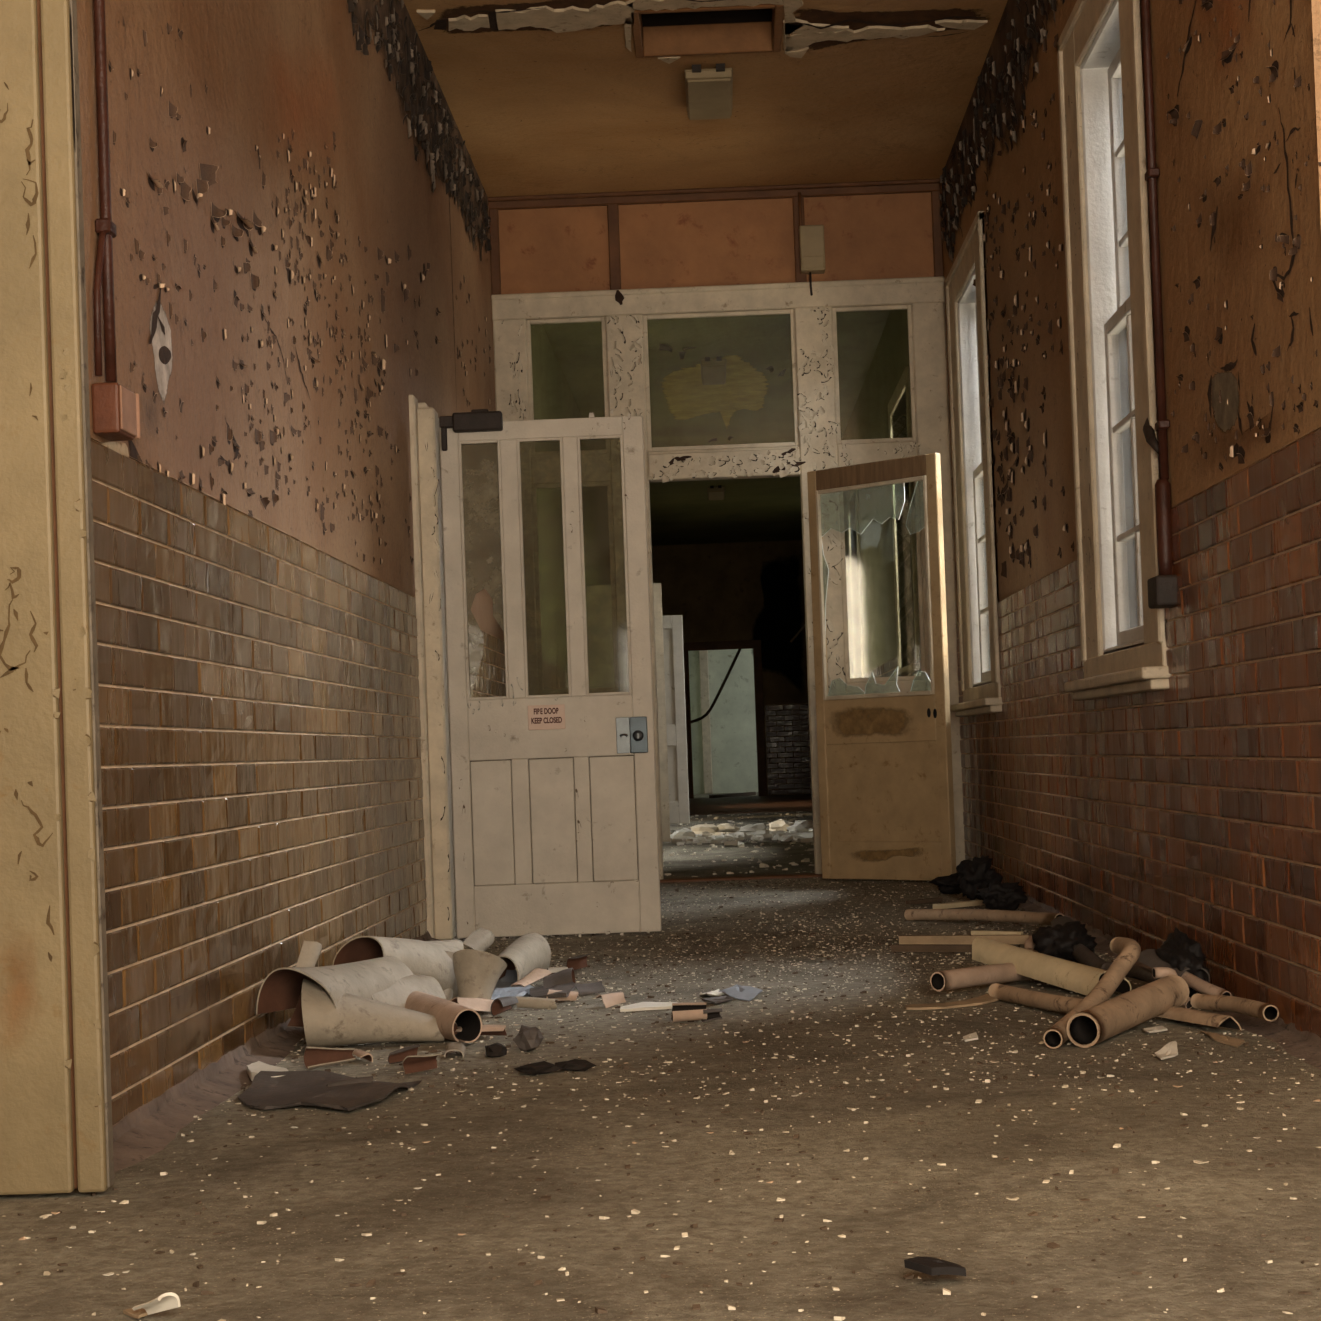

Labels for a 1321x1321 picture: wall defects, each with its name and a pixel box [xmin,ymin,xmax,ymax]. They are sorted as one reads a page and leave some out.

crack [0,82,39,269]
peeling [1166,94,1226,140]
peeling [1188,28,1279,243]
peeling [102,129,442,565]
flaking render [347,0,1090,585]
flaking render [1169,276,1318,472]
crack [0,567,49,692]
crack [14,781,55,962]